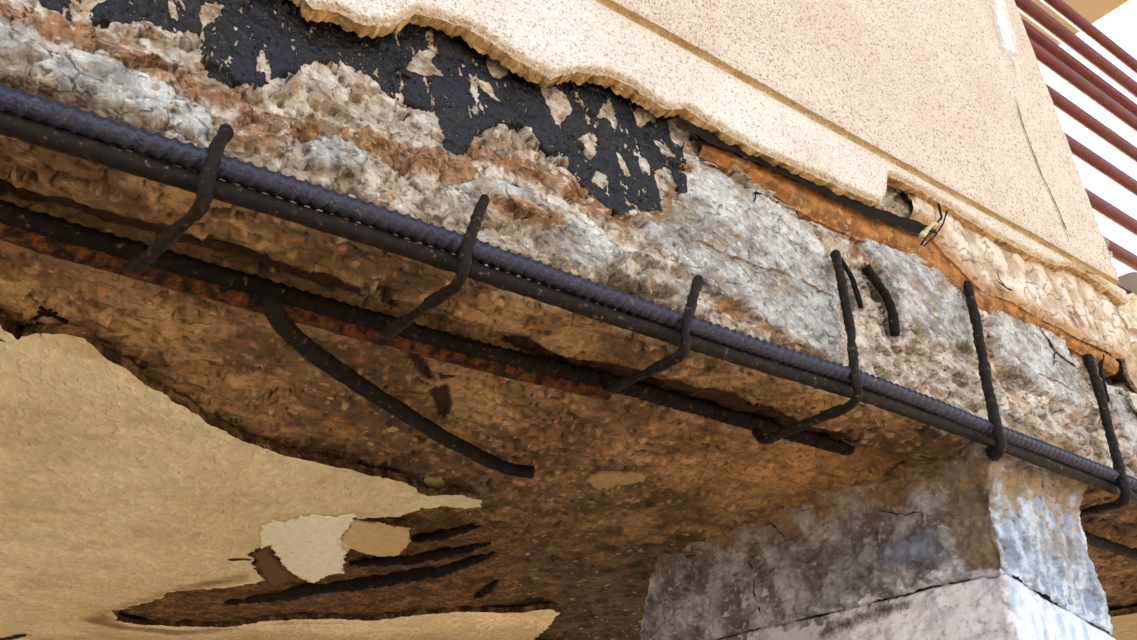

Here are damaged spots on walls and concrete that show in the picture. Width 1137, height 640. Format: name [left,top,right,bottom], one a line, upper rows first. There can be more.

corrosion [0,180,166,234]
corrosion [176,234,365,297]
corrosion [380,285,397,309]
spalling [0,0,1137,479]
crack [1015,98,1069,241]
corrosion [406,352,456,419]
spalling [0,134,973,640]
corrosion [499,335,859,443]
spalling [1079,485,1137,611]
crack [715,561,760,640]
crack [796,578,977,621]
crack [1012,575,1114,637]